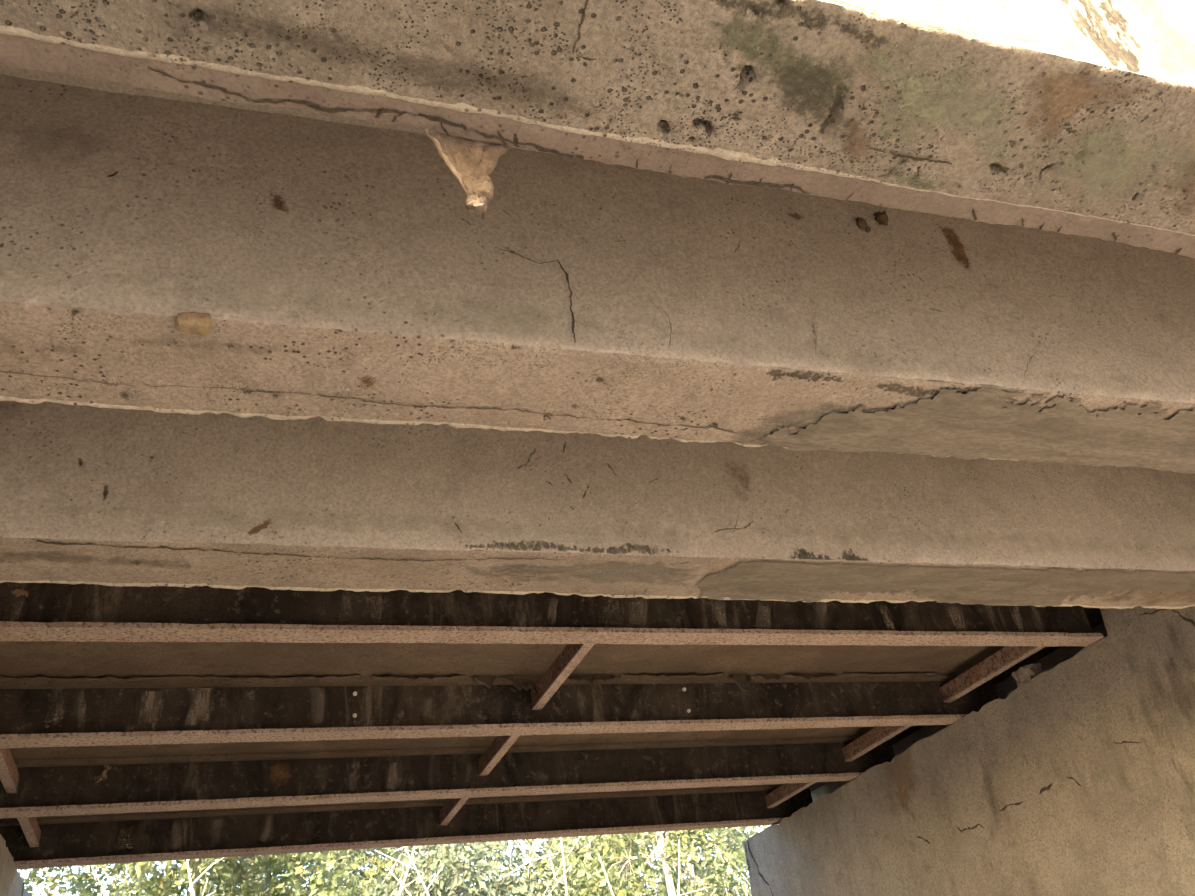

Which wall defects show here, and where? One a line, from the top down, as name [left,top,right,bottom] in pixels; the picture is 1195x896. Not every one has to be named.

damp [1061,0,1141,72]
peeling [421,128,514,220]
corrosion [942,228,969,268]
crack [497,247,576,343]
crack [1142,609,1195,626]
crack [957,777,1081,833]